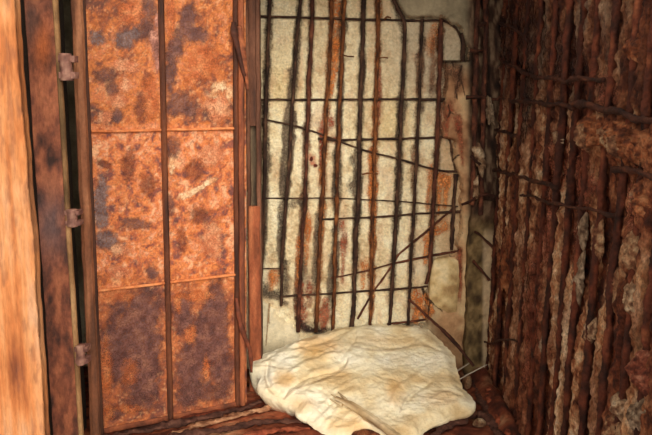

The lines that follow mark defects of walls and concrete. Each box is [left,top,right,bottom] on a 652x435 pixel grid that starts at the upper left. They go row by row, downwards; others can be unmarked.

corrosion [114,59,139,92]
corrosion [204,91,229,124]
corrosion [261,0,274,220]
damp [263,107,303,306]
corrosion [283,0,382,333]
damp [332,147,341,198]
damp [349,148,358,196]
corrosion [415,15,464,264]
spalling [261,0,652,435]
corrosion [269,220,287,288]
corrosion [101,351,111,388]
corrosion [103,399,310,435]